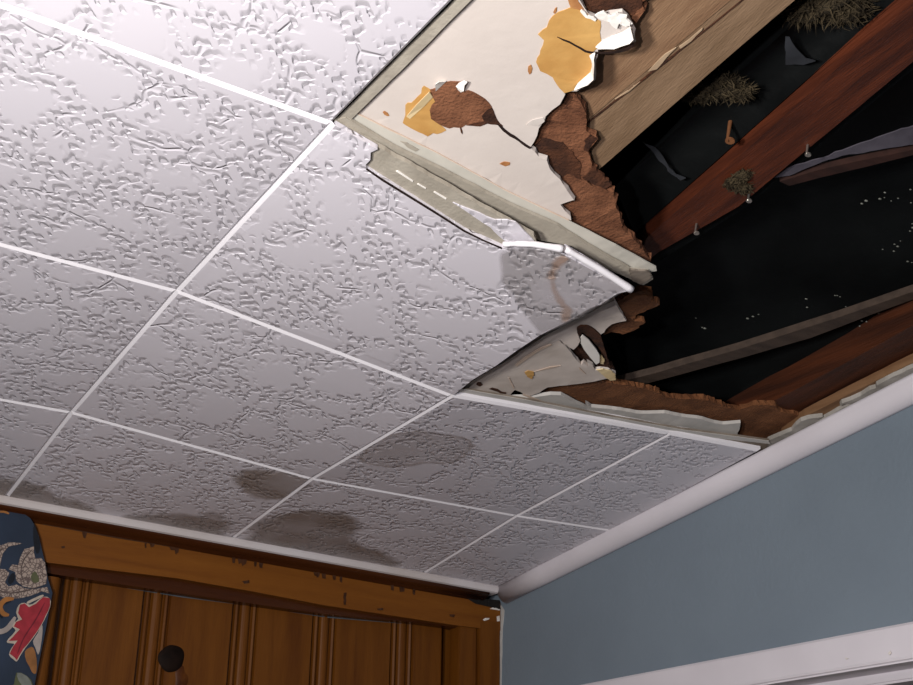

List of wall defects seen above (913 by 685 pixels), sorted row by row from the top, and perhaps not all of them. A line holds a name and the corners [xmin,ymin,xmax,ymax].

peeling [528,0,633,93]
peeling [403,81,503,136]
leakage [239,471,286,498]
leakage [281,512,355,533]